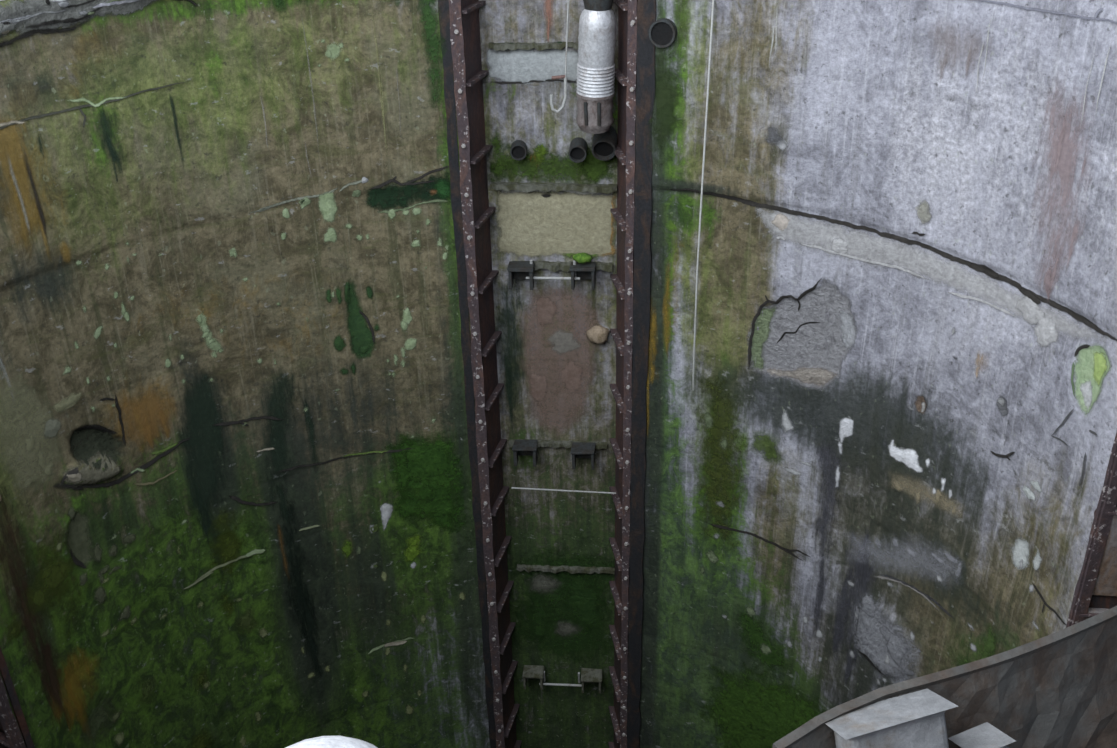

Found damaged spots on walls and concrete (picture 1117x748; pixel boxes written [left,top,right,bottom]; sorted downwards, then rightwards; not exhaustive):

spalling [0,0,157,47]
spalling [70,395,126,471]
damp [181,375,224,573]
damp [269,374,317,472]
corrosion [647,280,669,433]
crack [748,279,821,365]
damp [814,446,839,629]
damp [833,535,873,681]
crack [670,188,1117,341]
peeling [748,209,1110,416]